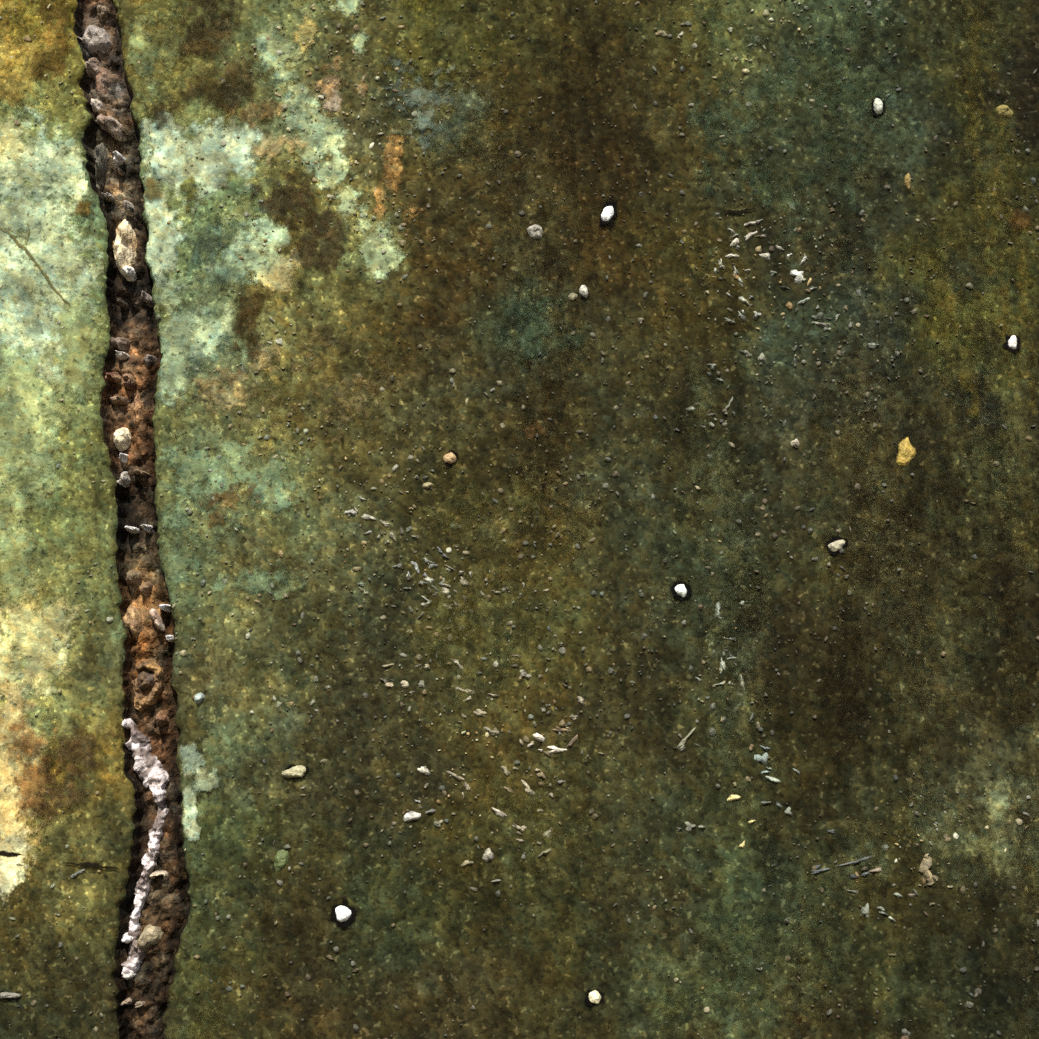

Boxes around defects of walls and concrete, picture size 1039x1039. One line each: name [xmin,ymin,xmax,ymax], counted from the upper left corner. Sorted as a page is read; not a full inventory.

rust [144,177,162,200]
rust [75,201,94,216]
crack [63,0,191,1039]
crack [0,851,29,868]